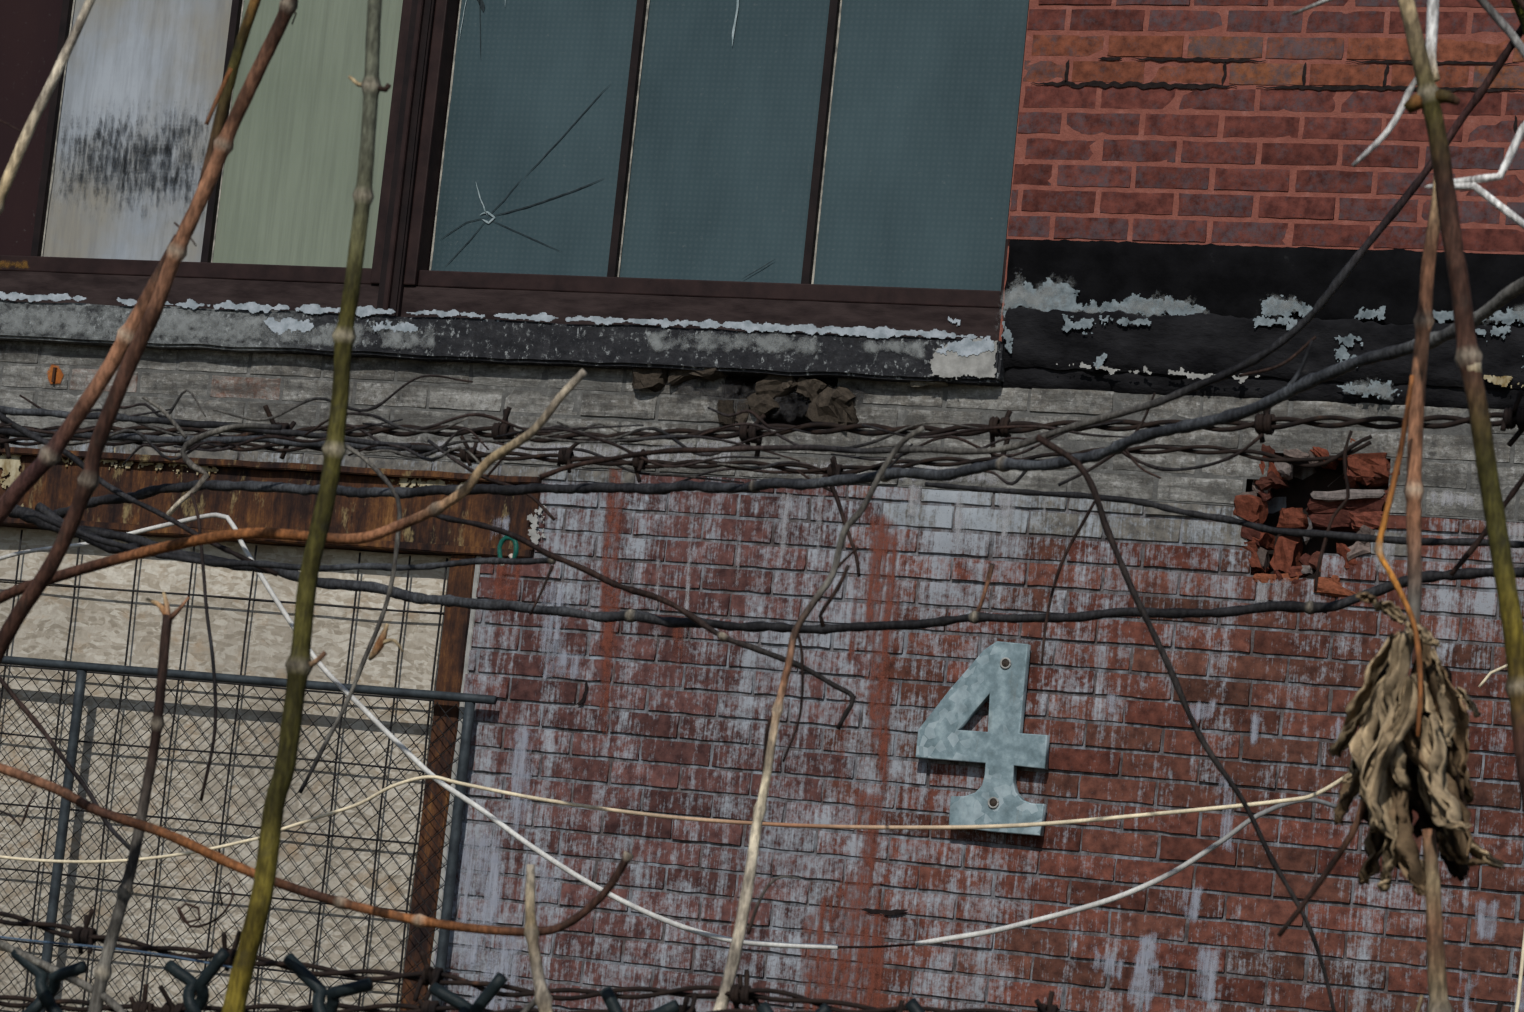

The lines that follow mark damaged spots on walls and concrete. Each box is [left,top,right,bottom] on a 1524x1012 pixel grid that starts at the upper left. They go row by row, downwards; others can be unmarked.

crack [1032,57,1524,132]
peeling [117,297,137,306]
peeling [1253,295,1313,330]
peeling [1433,310,1454,323]
peeling [1475,307,1524,342]
spalling [154,277,1206,432]
peeling [1056,353,1260,384]
peeling [1334,306,1402,399]
peeling [1483,356,1524,388]
peeling [390,477,466,488]
peeling [527,505,547,545]
spalling [1225,438,1400,597]